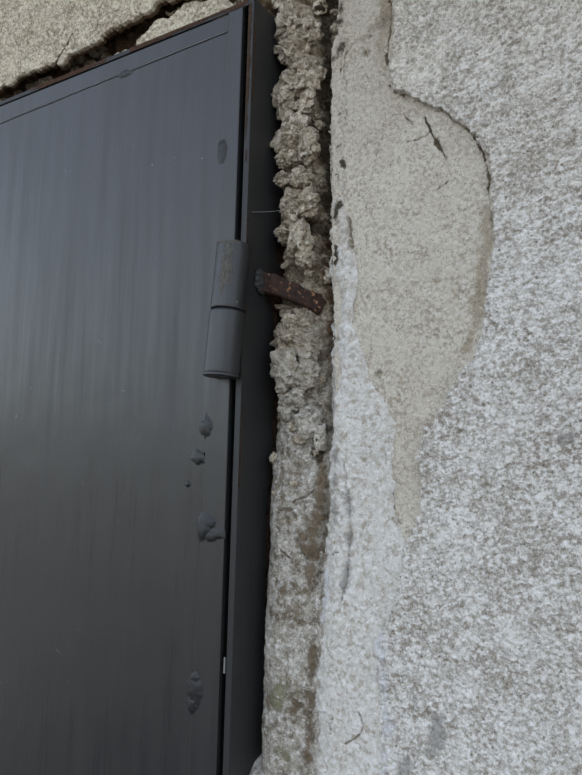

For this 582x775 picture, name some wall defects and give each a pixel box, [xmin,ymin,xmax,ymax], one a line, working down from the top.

crack [0,0,207,101]
crack [229,0,279,18]
crack [384,0,392,66]
crack [407,117,445,156]
crack [450,116,491,193]
flaking render [261,0,495,775]